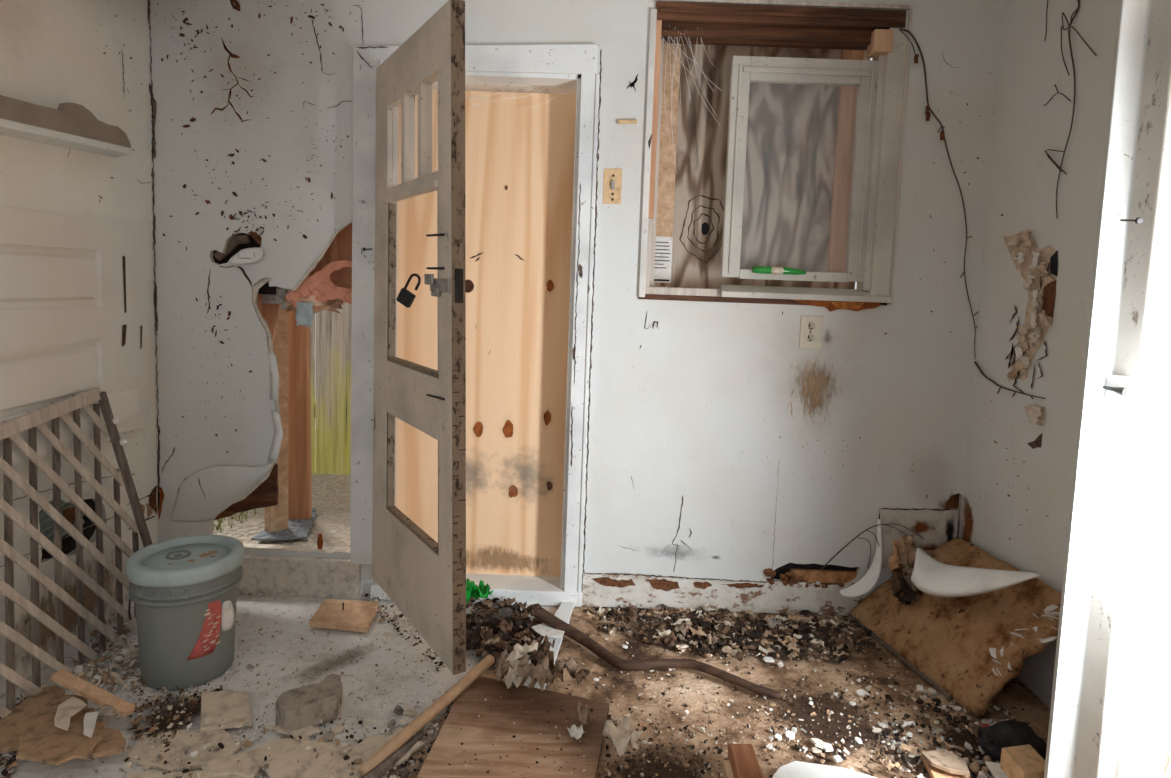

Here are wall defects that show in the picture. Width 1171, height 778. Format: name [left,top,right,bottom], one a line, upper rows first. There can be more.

crack [230,0,240,11]
crack [210,38,254,122]
crack [0,0,206,582]
peeling [181,283,236,367]
peeling [1004,229,1058,449]
peeling [592,577,680,591]
spalling [693,563,858,589]